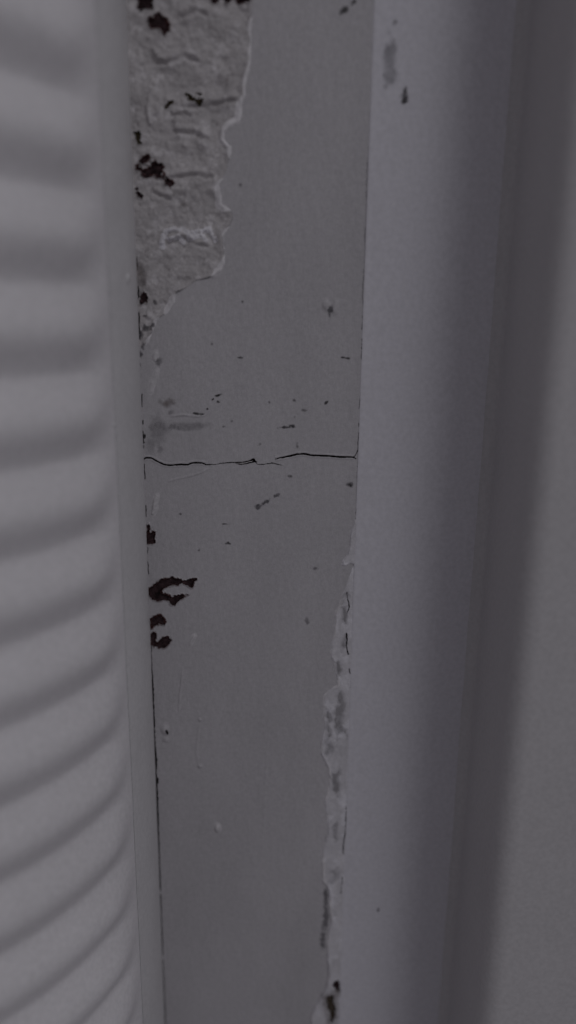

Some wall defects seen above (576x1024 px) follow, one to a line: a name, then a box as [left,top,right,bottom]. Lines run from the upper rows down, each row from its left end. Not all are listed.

peeling [126,0,253,346]
crack [141,394,360,479]
peeling [310,519,356,1024]